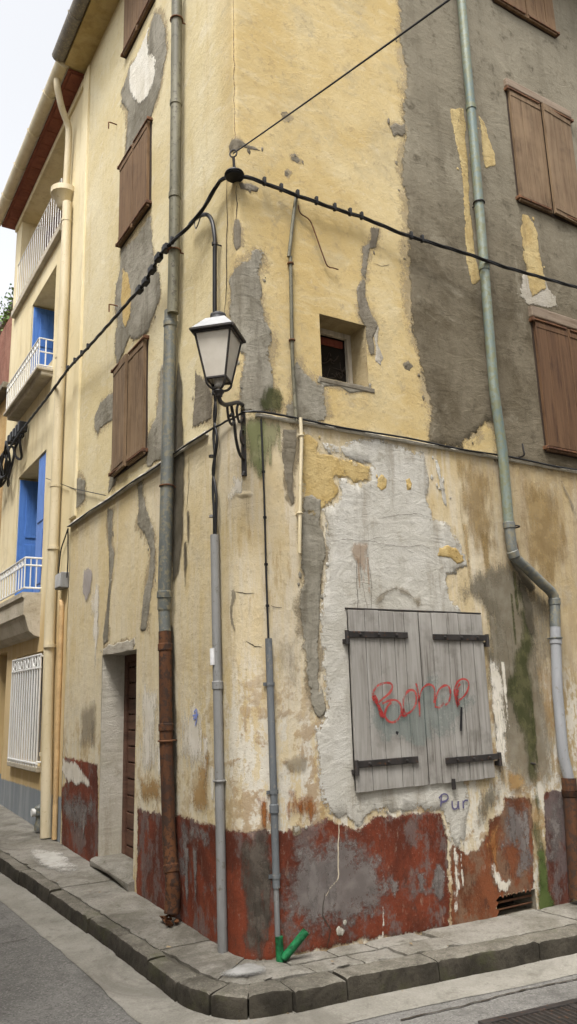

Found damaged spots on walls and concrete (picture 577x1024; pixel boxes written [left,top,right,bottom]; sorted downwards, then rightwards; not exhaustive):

peeling [387,0,577,472]
peeling [121,270,131,327]
peeling [302,432,387,516]
peeling [437,545,470,563]
water stain [458,462,574,824]
water stain [492,865,511,892]